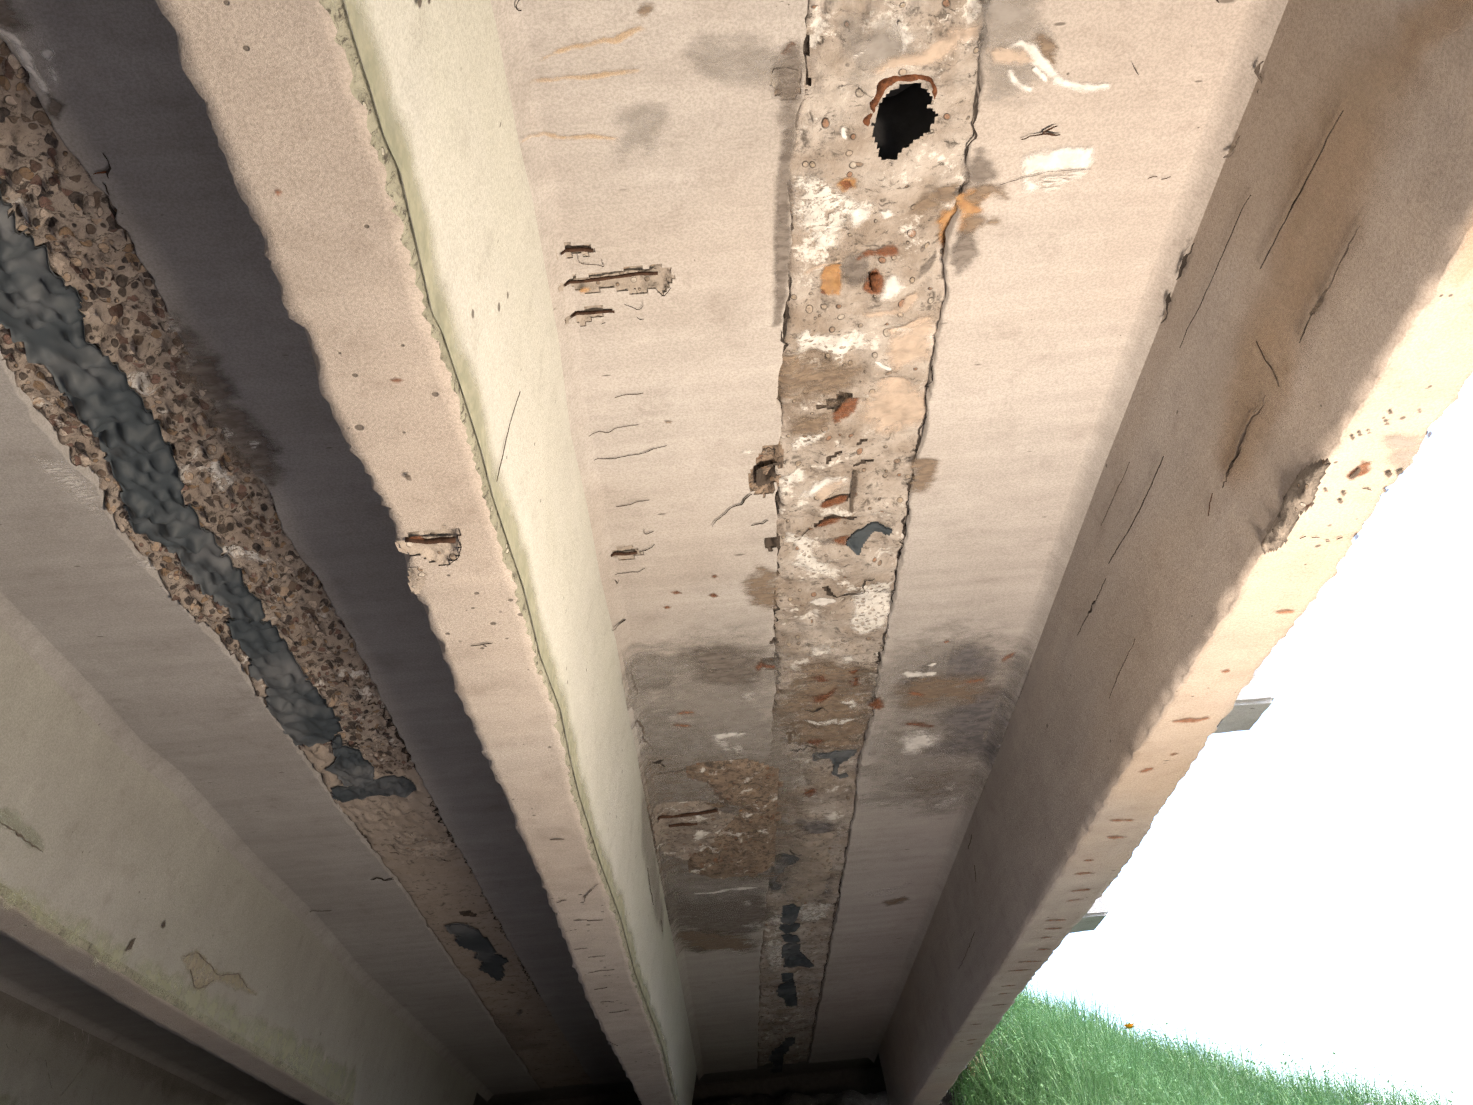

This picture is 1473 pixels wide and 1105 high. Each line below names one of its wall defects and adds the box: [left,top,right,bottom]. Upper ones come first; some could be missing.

crack [803,18,811,90]
efflorescence [1000,148,1093,191]
spalling [842,254,903,299]
rust [858,246,898,260]
rust [911,152,1008,278]
rust [833,398,858,423]
spalling [395,525,462,594]
spalling [712,441,784,527]
crack [773,274,827,752]
crack [822,356,933,711]
spalling [1260,458,1347,554]
water stain [626,641,1030,966]